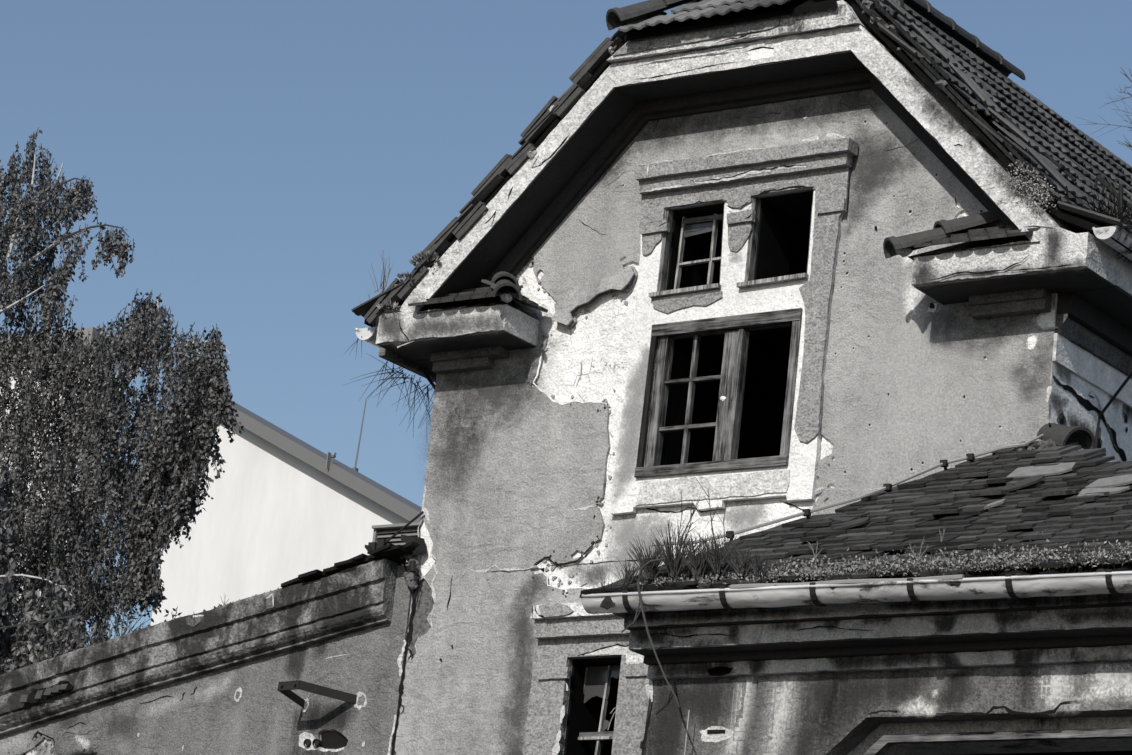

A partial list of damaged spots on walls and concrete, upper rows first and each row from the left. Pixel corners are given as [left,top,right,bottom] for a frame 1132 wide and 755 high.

flaking render [507,258,836,595]
crack [447,558,653,610]
leakage [288,640,325,679]
crack [387,558,421,755]
leakage [294,706,350,730]
crack [641,679,653,755]
flaking render [21,740,54,755]